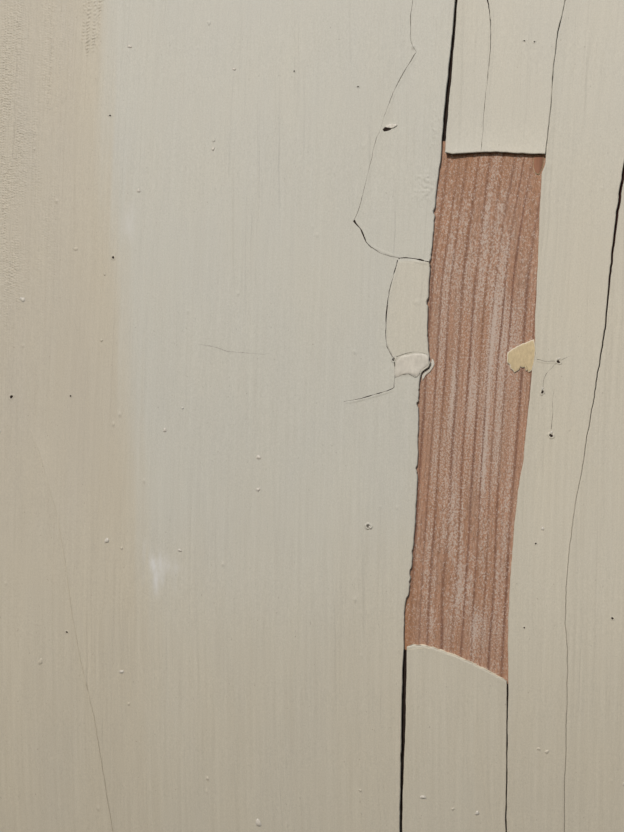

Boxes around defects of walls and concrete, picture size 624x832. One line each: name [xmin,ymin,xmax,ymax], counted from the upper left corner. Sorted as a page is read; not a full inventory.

crack [442,0,457,141]
crack [481,0,494,151]
crack [344,0,430,405]
peeling [404,141,546,684]
crack [569,165,624,550]
crack [399,650,407,832]
crack [502,684,510,832]